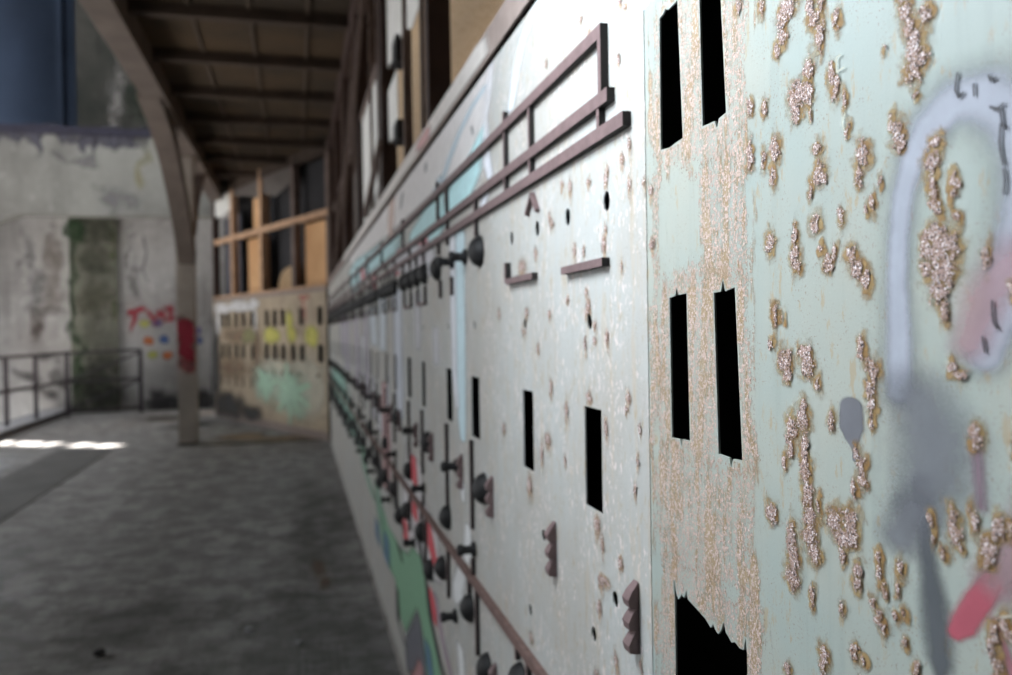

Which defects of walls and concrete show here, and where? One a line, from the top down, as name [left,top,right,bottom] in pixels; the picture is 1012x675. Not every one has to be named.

damp [0,72,148,168]
rust [918,129,966,329]
damp [77,218,114,317]
rust [583,289,609,357]
rust [620,0,921,675]
rust [946,355,968,382]
rust [966,421,986,454]
rust [594,516,604,554]
rust [596,574,609,619]